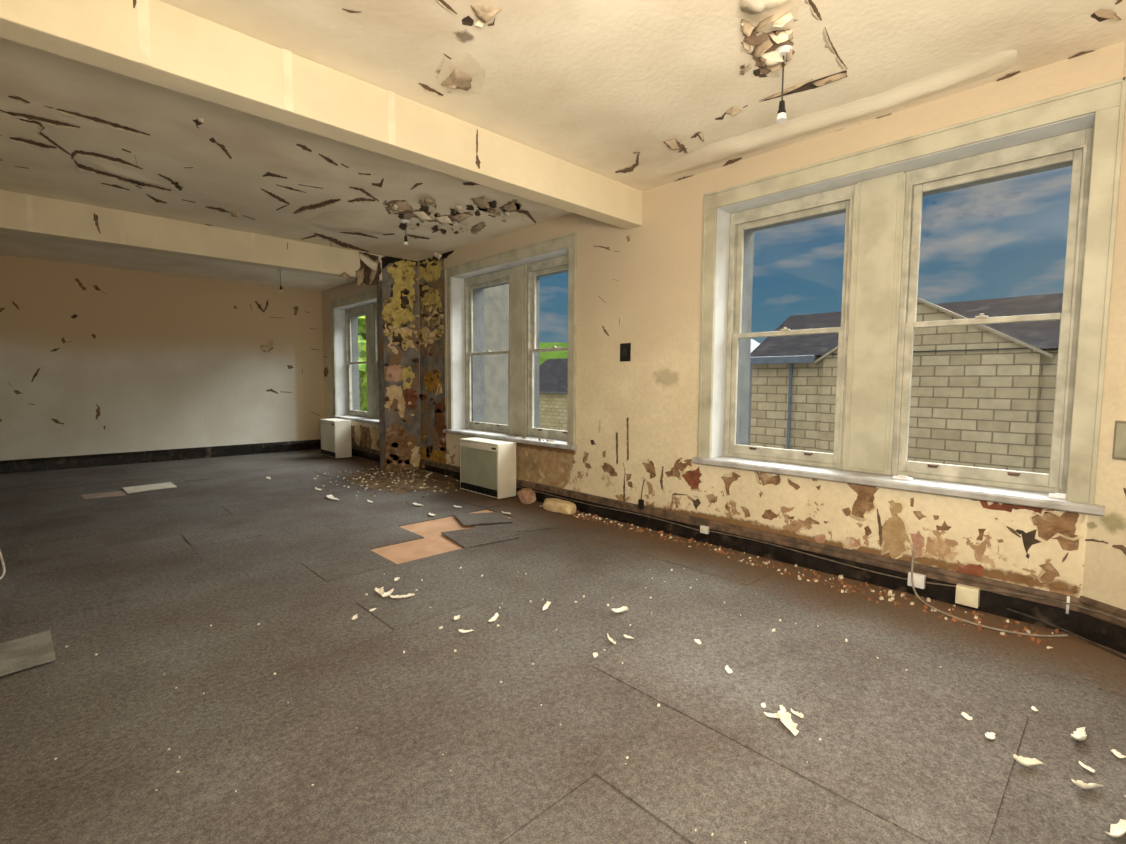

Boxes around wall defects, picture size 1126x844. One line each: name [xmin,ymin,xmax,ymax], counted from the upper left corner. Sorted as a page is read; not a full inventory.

peeling [436,0,502,42]
peeling [1091,0,1122,22]
peeling [715,0,847,120]
peeling [71,149,183,204]
peeling [615,152,640,174]
peeling [339,182,536,239]
peeling [338,252,447,472]
spalling [572,440,617,476]
peeling [642,457,828,543]
peeling [840,476,951,559]
spalling [957,560,984,577]
peeling [971,499,1126,583]